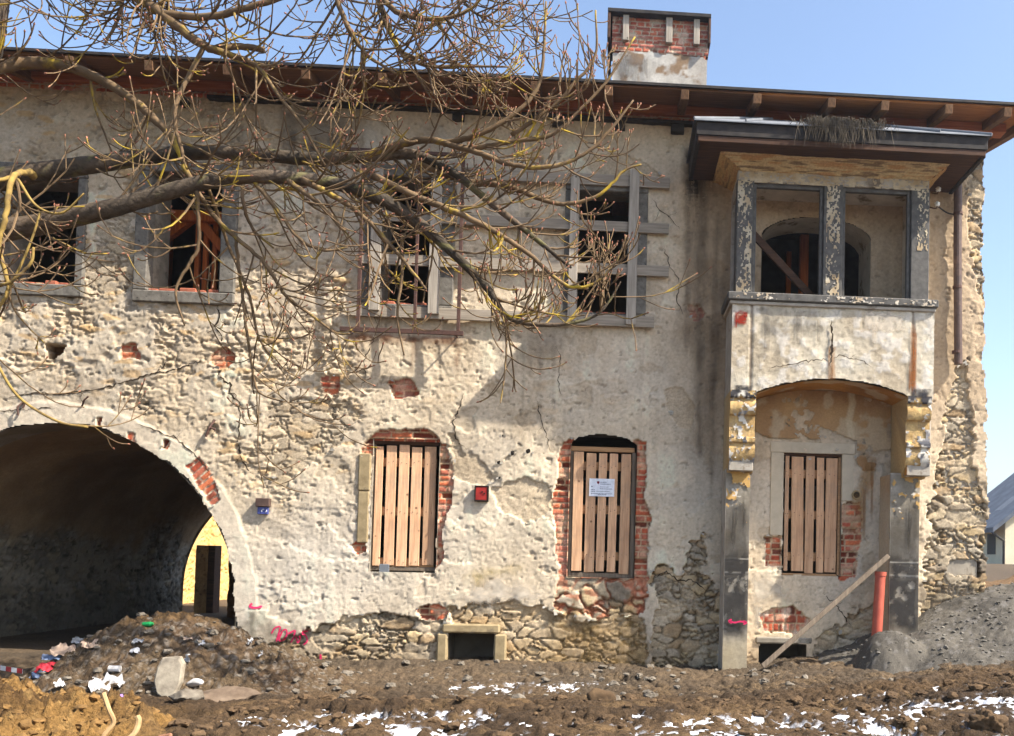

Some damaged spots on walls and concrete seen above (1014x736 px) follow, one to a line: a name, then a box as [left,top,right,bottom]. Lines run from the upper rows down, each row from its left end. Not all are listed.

peeling [736,170,936,306]
crack [2,361,253,474]
flaking render [186,457,221,507]
crack [209,306,226,345]
flaking render [267,374,363,492]
flaking render [389,378,420,400]
flaking render [726,390,891,507]
crack [772,320,868,370]
flaking render [891,358,988,613]
flaking render [269,428,720,668]
flaking render [759,605,810,635]
flaking render [813,604,873,657]